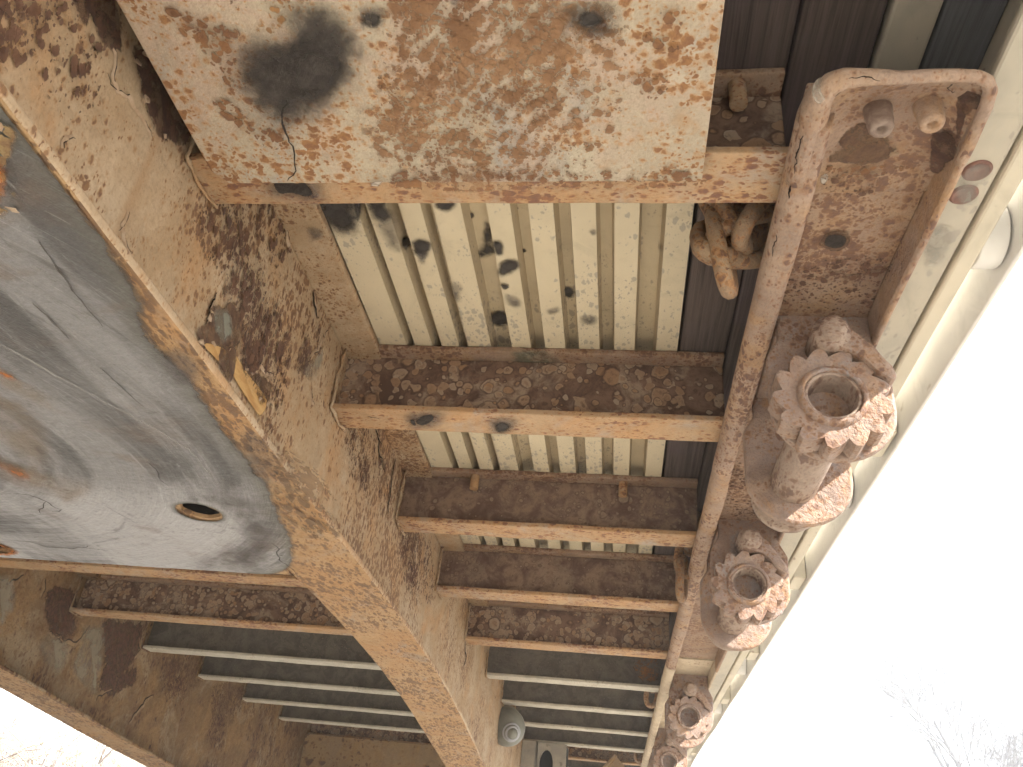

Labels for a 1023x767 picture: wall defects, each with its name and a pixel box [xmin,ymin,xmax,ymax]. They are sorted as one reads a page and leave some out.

rust [165,8,246,89]
rust [257,0,308,34]
rust [213,99,285,150]
rust [367,0,707,192]
rust [823,123,913,199]
rust [930,91,981,173]
rust [783,256,890,310]
rust [44,586,78,643]
rust [98,619,142,697]